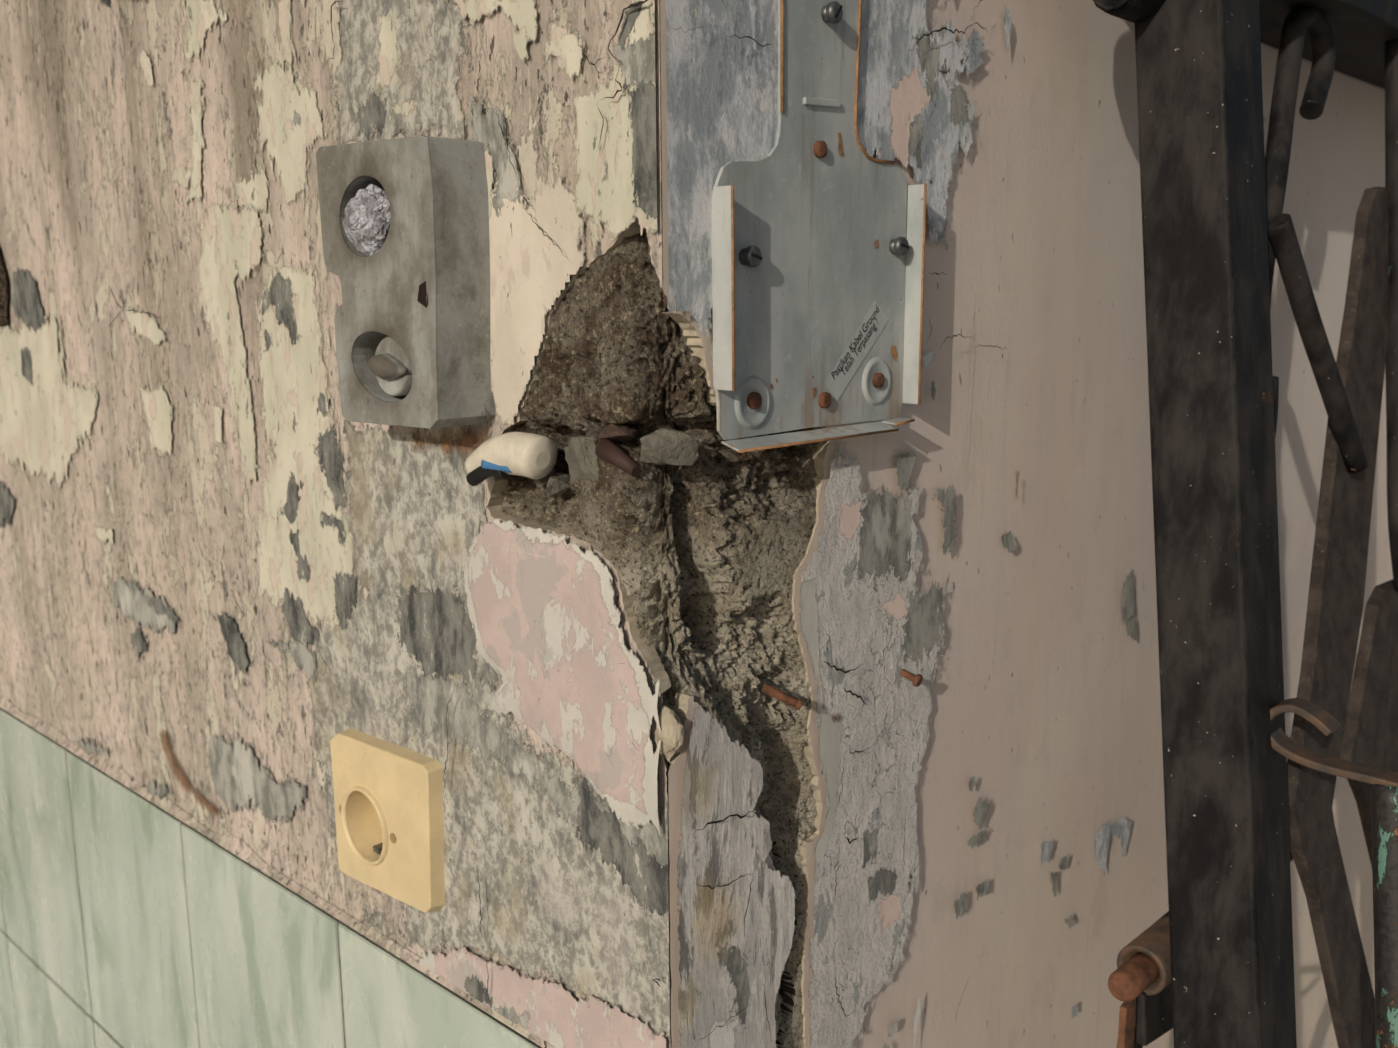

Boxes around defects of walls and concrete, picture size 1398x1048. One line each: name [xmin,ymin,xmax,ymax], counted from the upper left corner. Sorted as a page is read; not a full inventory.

peeling [139,49,153,87]
peeling [857,0,985,254]
peeling [124,306,166,347]
peeling [0,255,102,528]
peeling [140,384,173,459]
spalling [171,0,957,1048]
peeling [1002,530,1017,553]
peeling [111,575,179,661]
crack [824,661,867,705]
peeling [967,776,990,849]
crack [693,746,872,1048]
peeling [954,879,989,919]